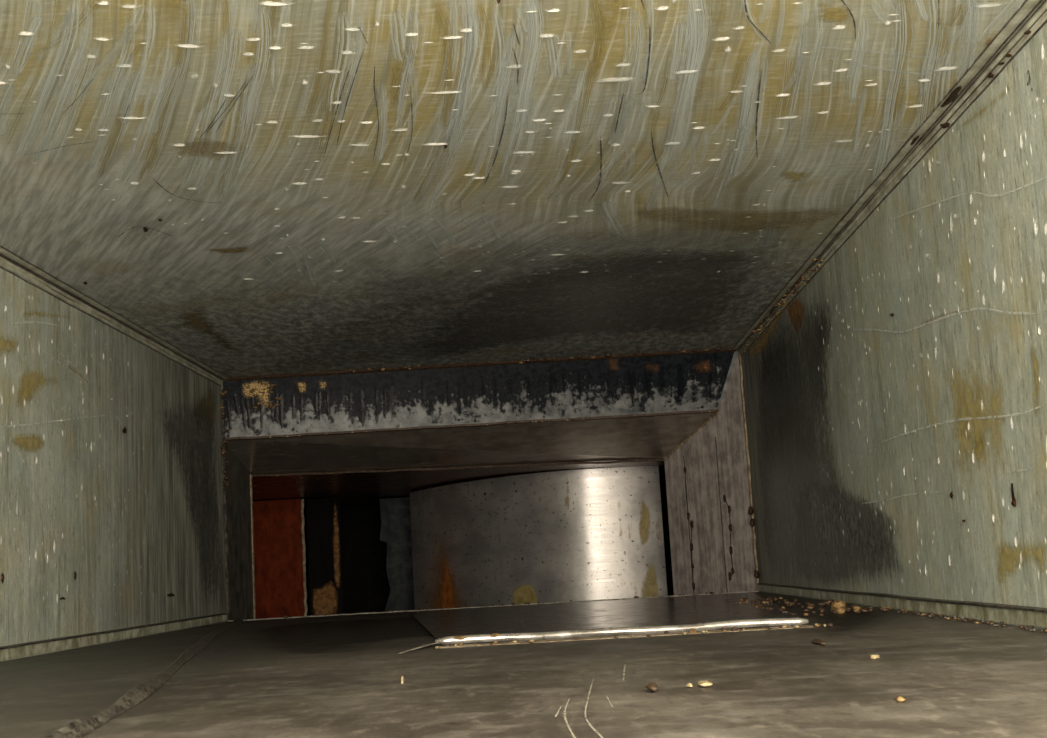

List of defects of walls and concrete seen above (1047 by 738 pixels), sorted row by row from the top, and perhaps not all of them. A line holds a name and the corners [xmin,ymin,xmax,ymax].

rust [940,85,962,108]
damp [1,371,43,405]
rust [243,382,283,409]
damp [952,373,1012,463]
damp [0,436,45,464]
damp [999,539,1043,578]